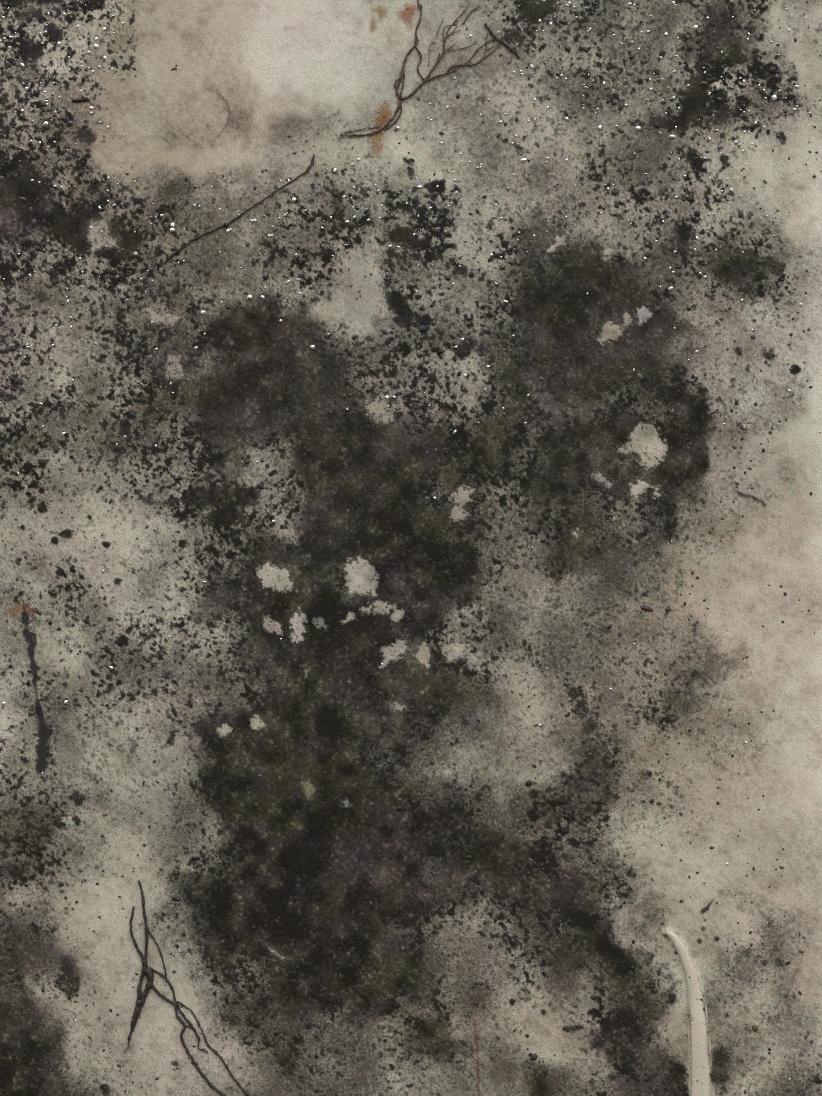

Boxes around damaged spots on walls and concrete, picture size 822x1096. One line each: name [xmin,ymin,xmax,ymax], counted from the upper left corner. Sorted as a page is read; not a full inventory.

crack [21,610,52,774]
damp [696,910,822,1096]